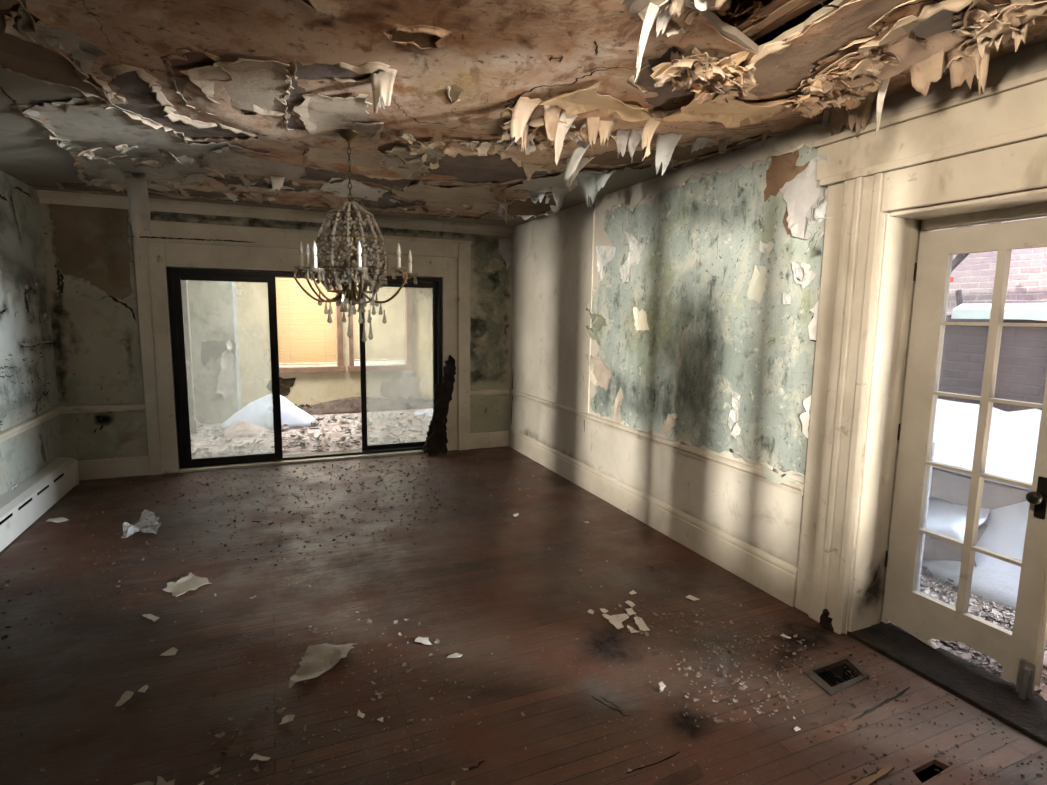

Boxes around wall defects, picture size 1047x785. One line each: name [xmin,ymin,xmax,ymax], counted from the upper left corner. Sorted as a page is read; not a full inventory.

flaking render [0,0,1047,304]
crack [0,184,81,243]
crack [54,264,64,297]
peeling [633,307,649,331]
spalling [808,288,820,342]
crack [0,287,54,425]
peeling [584,312,623,422]
peeling [660,413,678,435]
peeling [728,388,741,438]
spalling [799,395,812,438]